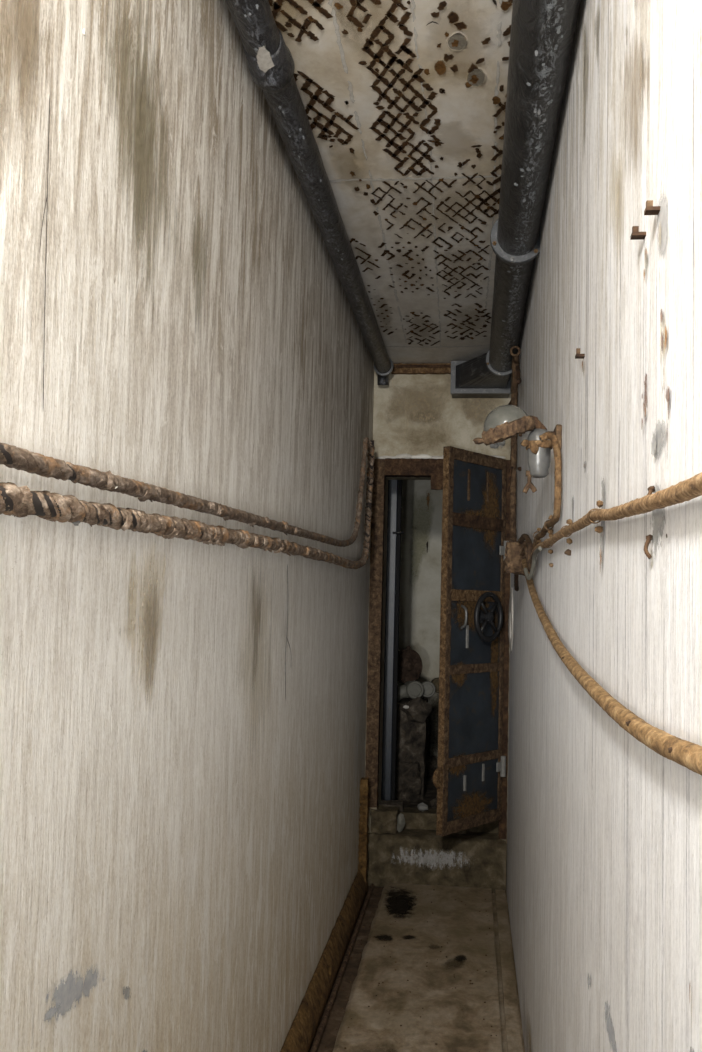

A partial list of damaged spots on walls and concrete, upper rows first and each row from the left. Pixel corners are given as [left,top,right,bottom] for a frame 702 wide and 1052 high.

water stain [105,5,177,285]
corrosion [268,0,507,346]
water stain [193,226,207,327]
peeling [651,420,665,457]
water stain [385,887,417,919]